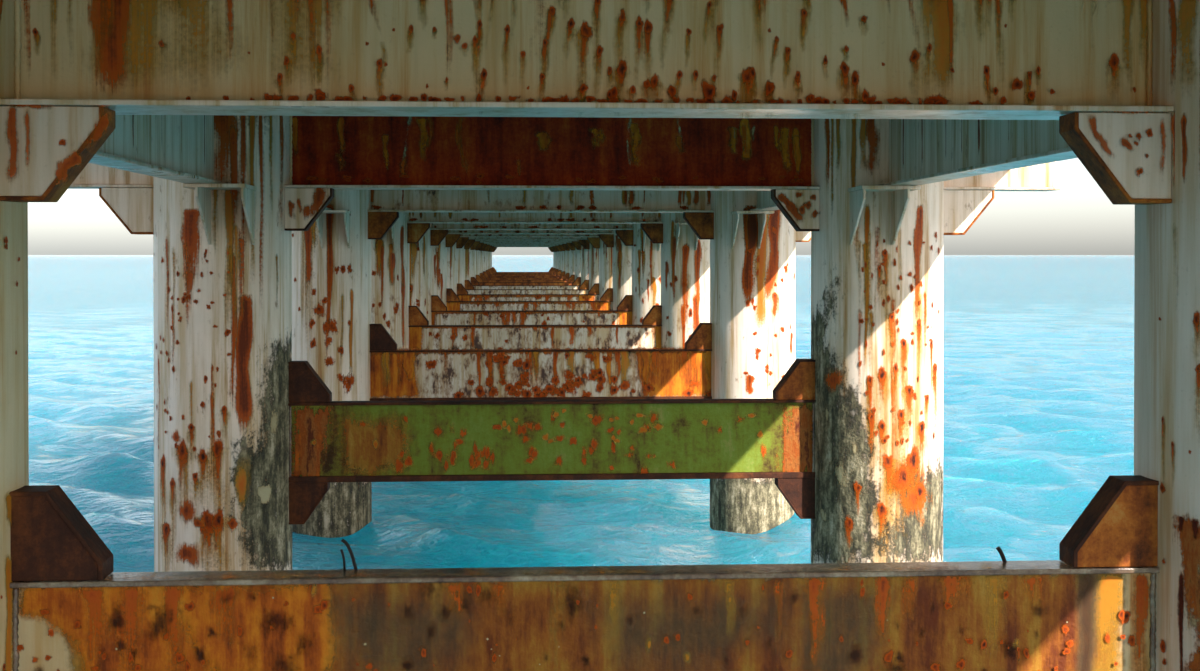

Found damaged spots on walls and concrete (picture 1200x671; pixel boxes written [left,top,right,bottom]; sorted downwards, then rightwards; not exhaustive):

corrosion [24,0,71,65]
corrosion [55,0,234,184]
corrosion [250,0,957,201]
corrosion [975,0,1007,47]
corrosion [969,65,1041,105]
corrosion [1089,112,1200,180]
damp [229,337,372,570]
corrosion [1,115,1149,671]
damp [710,478,794,534]
damp [811,277,943,563]
corrosion [1160,417,1174,493]
corrosion [1160,515,1200,671]